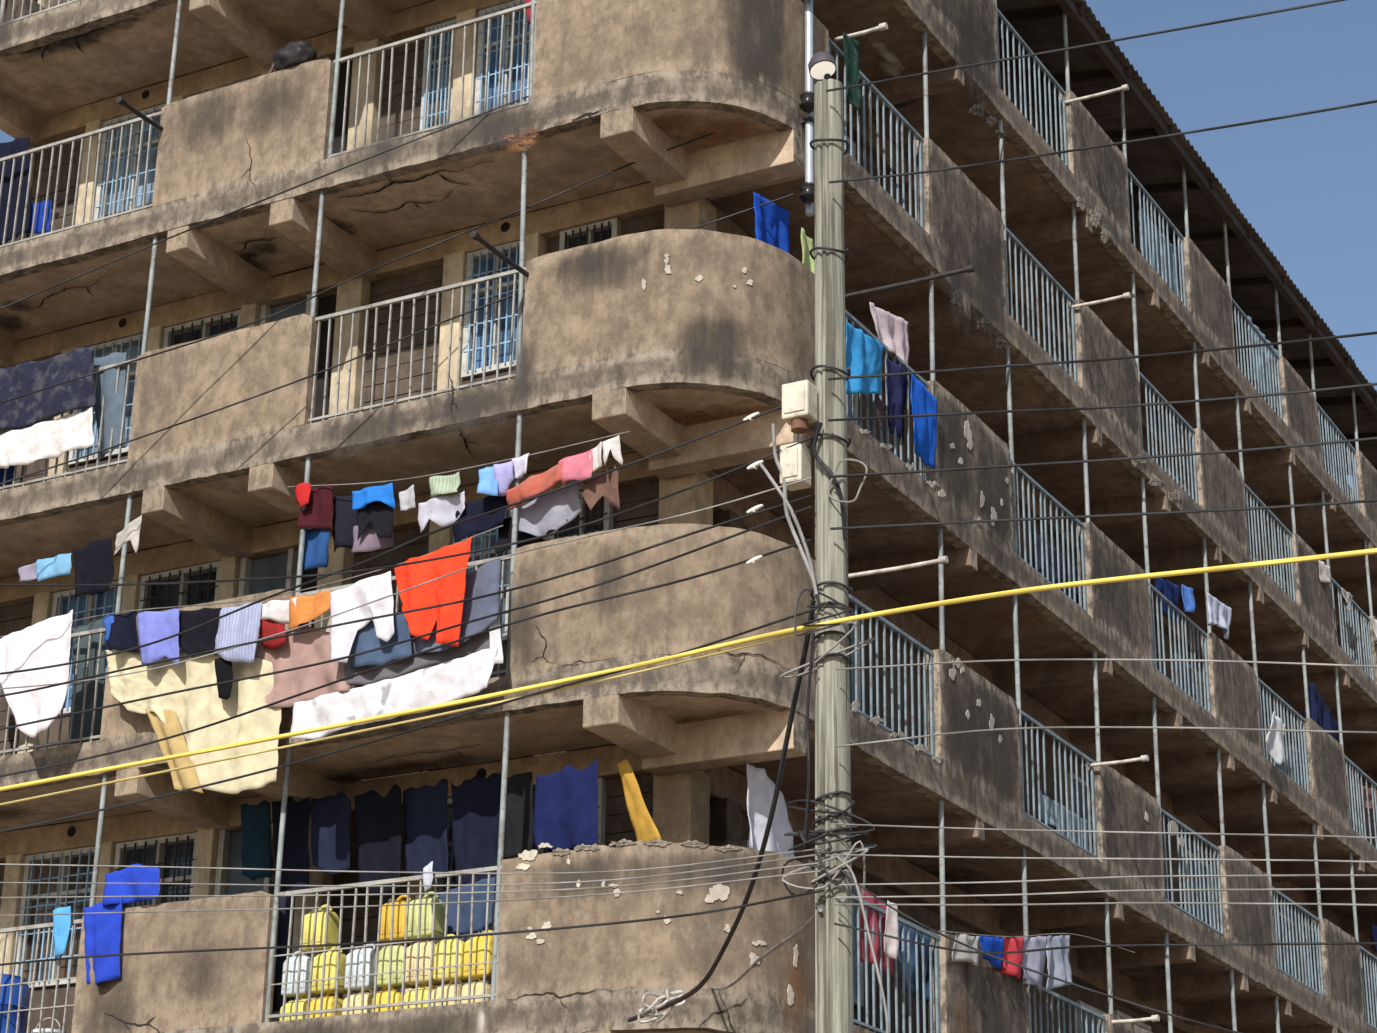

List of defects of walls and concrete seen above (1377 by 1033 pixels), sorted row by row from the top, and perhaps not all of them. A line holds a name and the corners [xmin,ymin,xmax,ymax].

crack [339,161,495,213]
crack [26,273,116,311]
water stain [684,322,737,371]
peeling [949,420,973,464]
peeling [977,478,1009,527]
spalling [515,838,742,871]
peeling [705,884,730,903]
peeling [526,921,552,944]
peeling [749,940,767,966]
crack [105,1013,160,1033]
crack [699,991,750,1033]